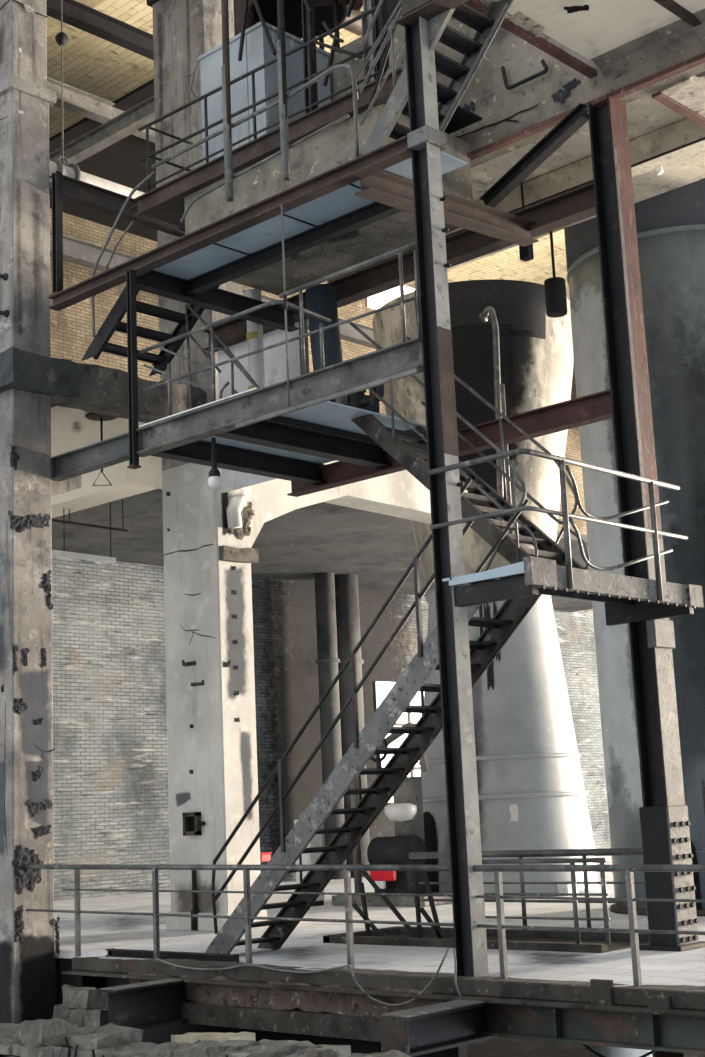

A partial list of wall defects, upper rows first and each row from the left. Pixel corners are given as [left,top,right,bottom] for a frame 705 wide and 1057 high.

crack [456,105,538,138]
spalling [8,510,50,533]
spalling [230,502,254,540]
crack [163,544,214,556]
crack [180,625,214,644]
spalling [12,799,53,942]